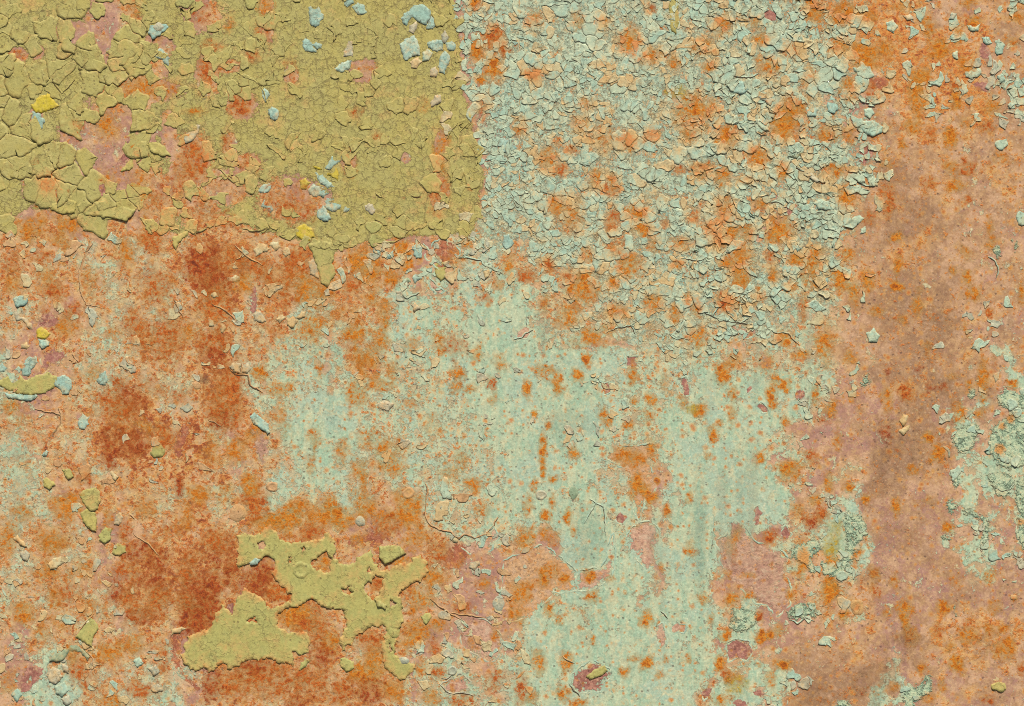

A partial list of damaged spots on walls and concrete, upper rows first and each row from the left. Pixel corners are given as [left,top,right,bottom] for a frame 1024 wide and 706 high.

corrosion [37,514,404,706]
crack [0,0,503,307]
corrosion [108,201,416,461]
corrosion [240,458,462,676]
peeling [133,373,661,706]
corrosion [516,411,576,549]
corrosion [522,306,619,396]
peeling [192,0,1024,451]
peeling [733,667,814,706]
corrosion [759,351,792,426]
peeling [715,463,868,663]
peeling [932,372,1024,583]